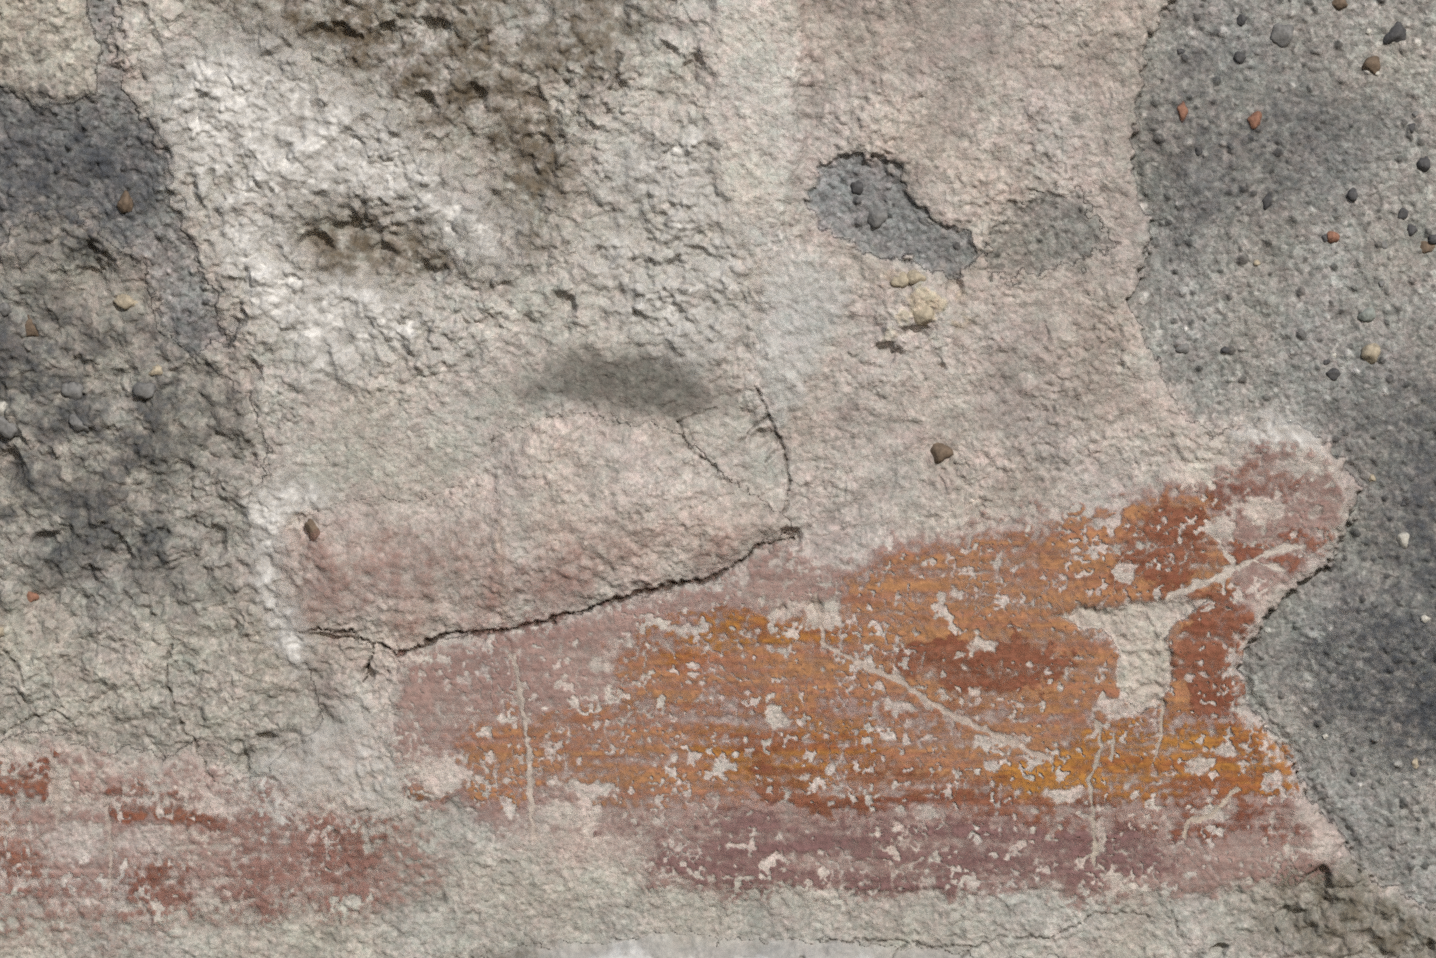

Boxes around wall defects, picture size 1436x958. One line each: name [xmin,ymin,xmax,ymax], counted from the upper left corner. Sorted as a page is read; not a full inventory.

crack [300,537,794,682]
spalling [394,0,1436,910]